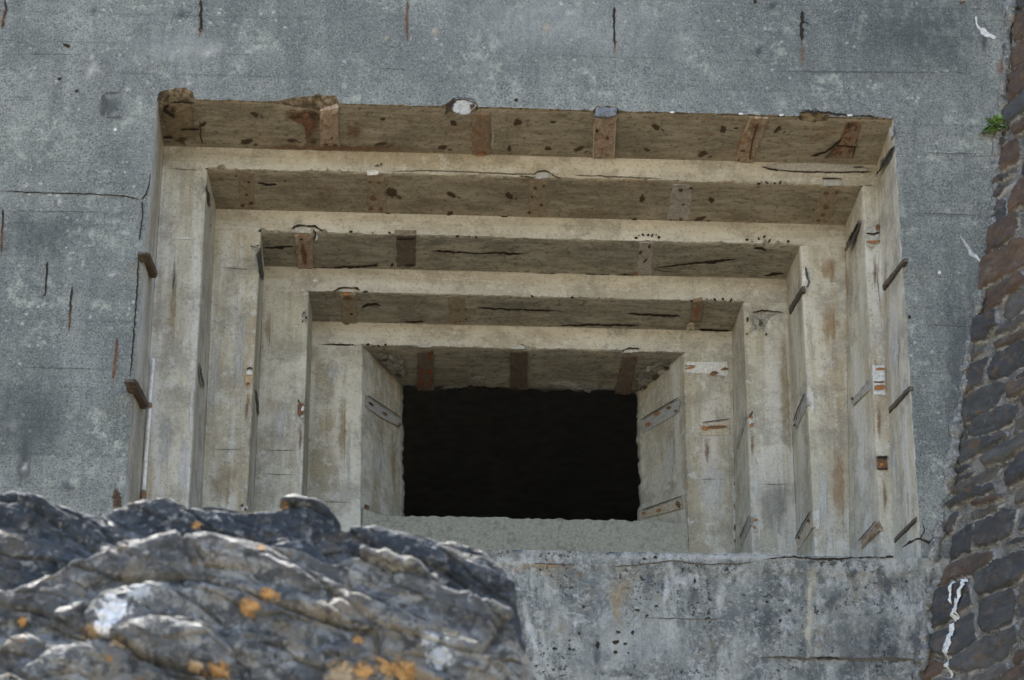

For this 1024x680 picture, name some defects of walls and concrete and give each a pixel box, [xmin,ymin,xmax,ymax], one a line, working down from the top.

spalling [445,97,477,126]
crack [14,173,151,373]
crack [436,249,525,257]
crack [584,247,784,276]
rust [876,456,888,470]
efflorescence [942,577,968,678]